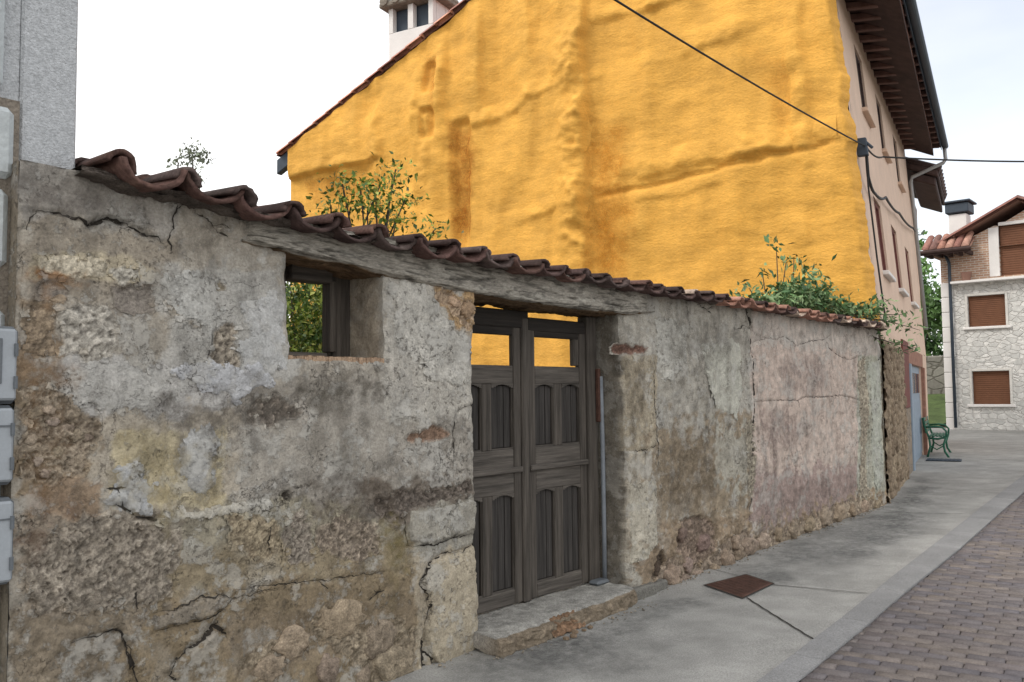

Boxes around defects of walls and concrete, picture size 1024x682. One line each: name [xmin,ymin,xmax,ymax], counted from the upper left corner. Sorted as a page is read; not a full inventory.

crack [26,202,230,251]
spalling [14,252,304,492]
peeling [387,279,476,404]
peeling [609,316,689,382]
crack [738,311,856,520]
crack [71,628,138,682]
spalling [25,422,479,682]
crack [134,571,384,681]
crack [404,509,472,666]